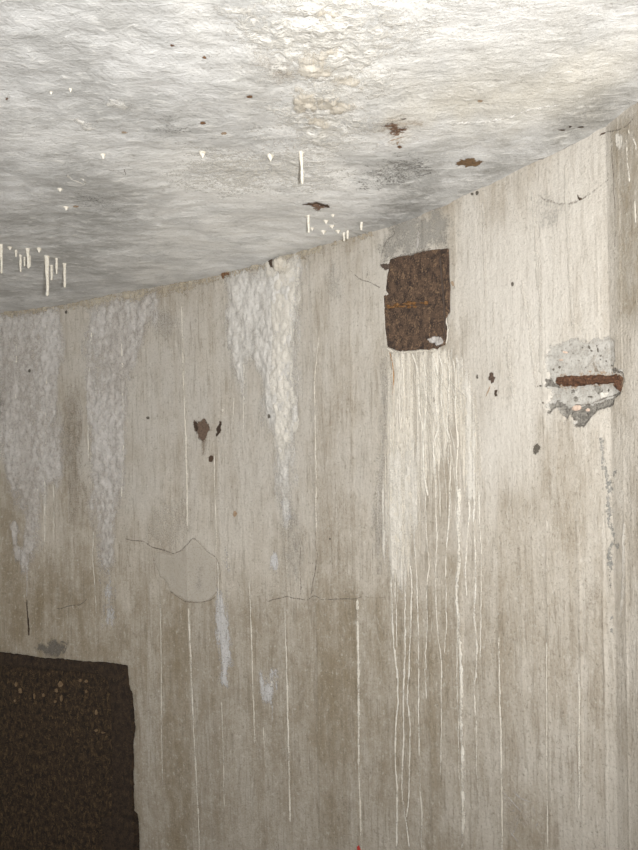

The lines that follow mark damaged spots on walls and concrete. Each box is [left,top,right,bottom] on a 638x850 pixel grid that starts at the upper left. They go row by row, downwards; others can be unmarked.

water stain [173,0,440,196]
rust [303,202,329,211]
rust [384,118,407,148]
rust [456,158,482,167]
spalling [537,337,624,427]
water stain [0,231,373,626]
rust [193,409,224,462]
water stain [376,347,482,848]